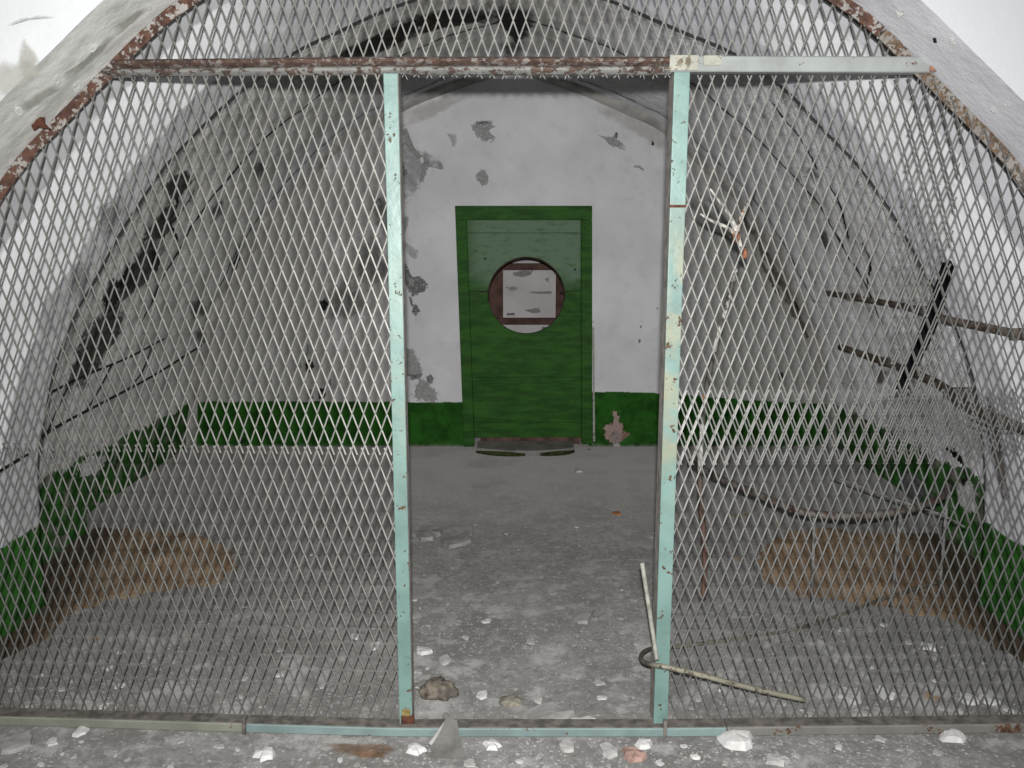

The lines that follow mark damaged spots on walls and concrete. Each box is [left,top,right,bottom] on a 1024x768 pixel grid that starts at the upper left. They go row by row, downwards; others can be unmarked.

rust [31,117,51,131]
peeling [404,129,443,183]
peeling [476,169,488,186]
peeling [471,120,495,143]
spalling [598,132,624,149]
spalling [405,264,428,316]
spalling [406,348,437,402]
spalling [592,321,630,447]